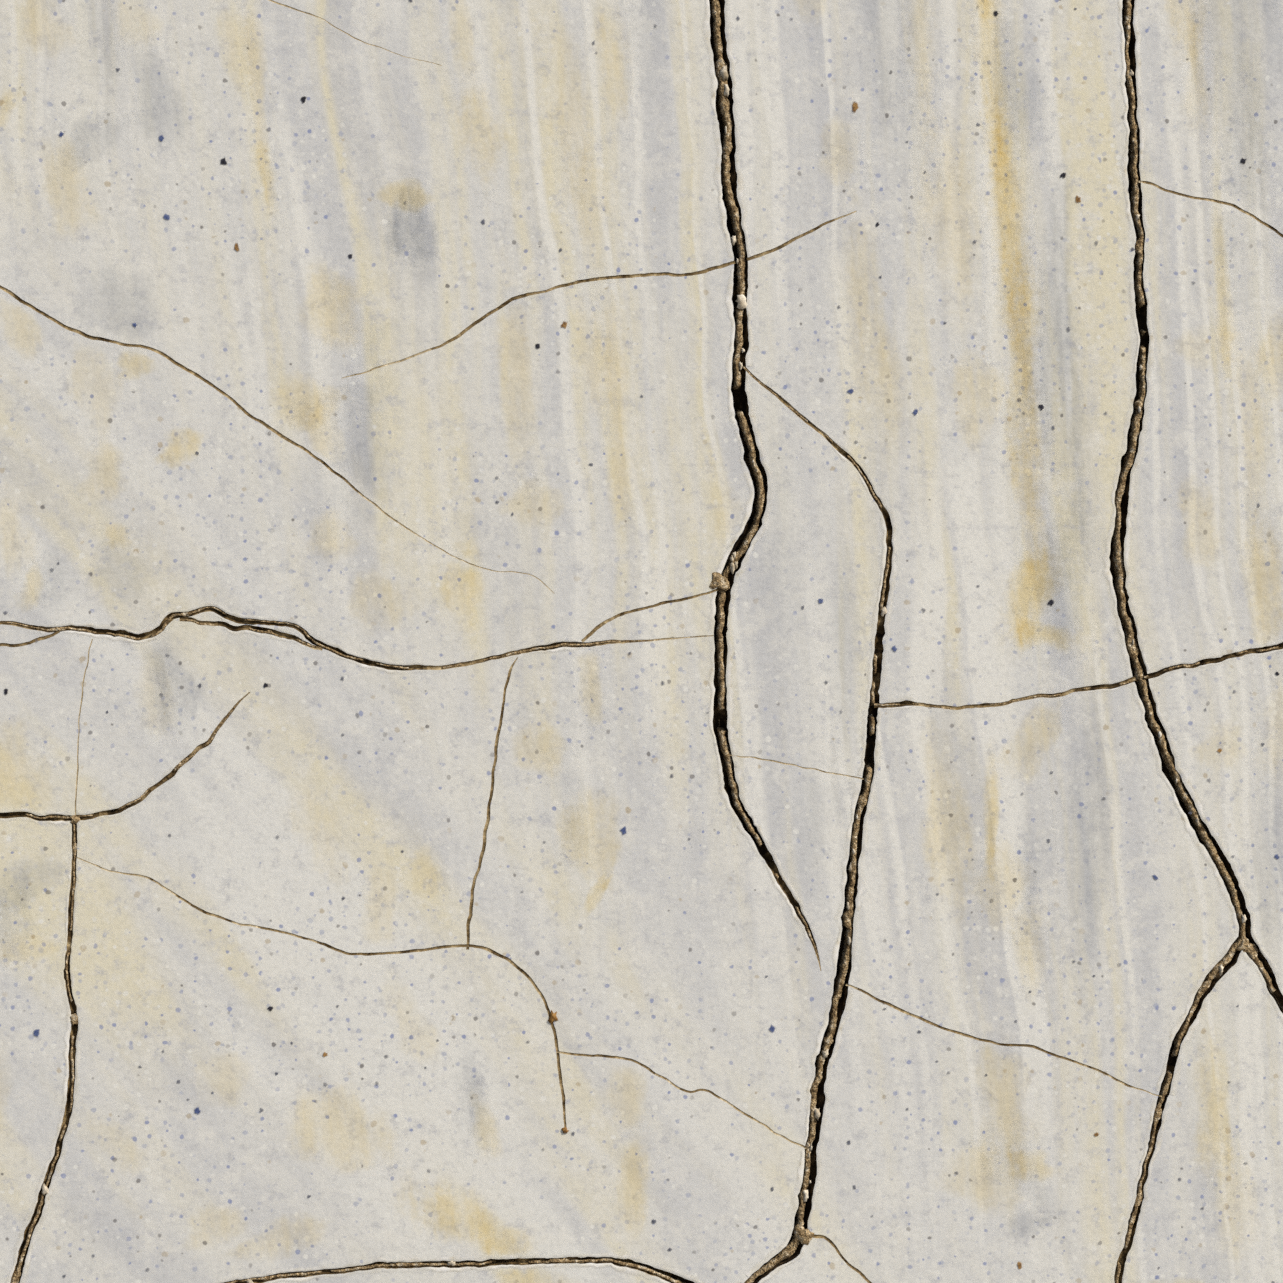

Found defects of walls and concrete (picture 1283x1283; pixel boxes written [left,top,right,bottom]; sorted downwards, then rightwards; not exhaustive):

crack [269,0,442,66]
crack [0,285,554,593]
crack [0,603,713,673]
crack [343,0,1283,1283]
crack [0,639,807,1283]